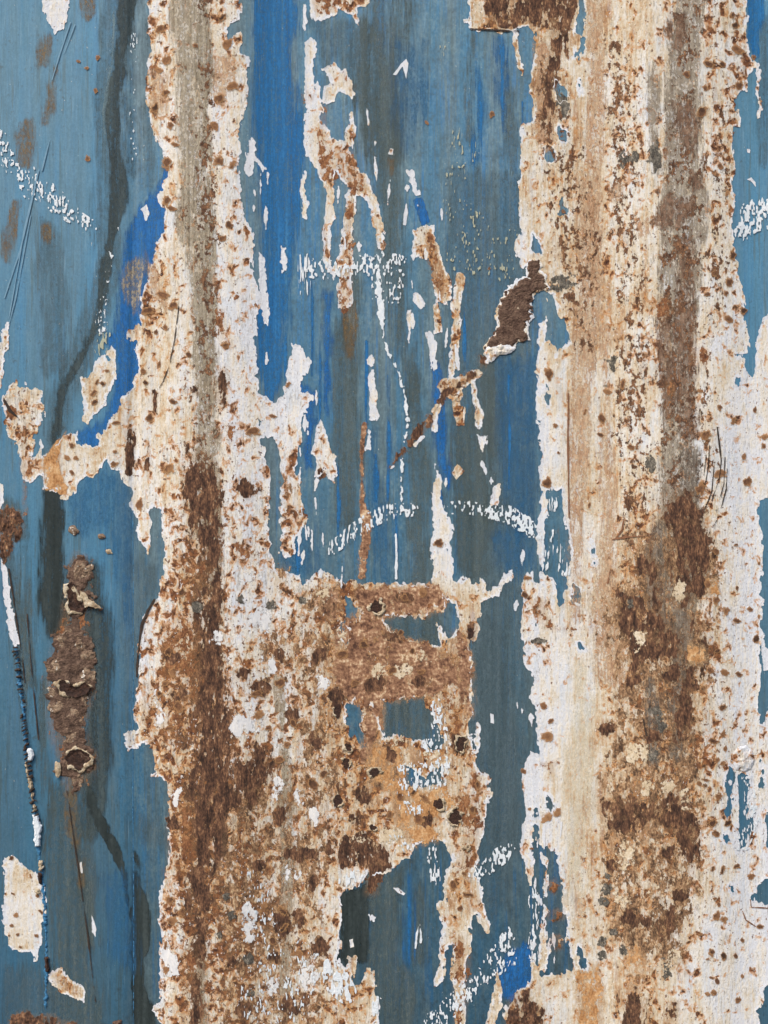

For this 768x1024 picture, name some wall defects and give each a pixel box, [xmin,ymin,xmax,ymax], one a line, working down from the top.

peeling [244,137,269,194]
peeling [299,37,496,452]
rust [110,421,150,476]
rust [140,0,484,1024]
peeling [311,419,338,515]
peeling [366,458,514,670]
rust [483,0,760,1024]
peeling [1,855,47,962]
peeling [500,927,515,957]
peeling [540,852,549,897]